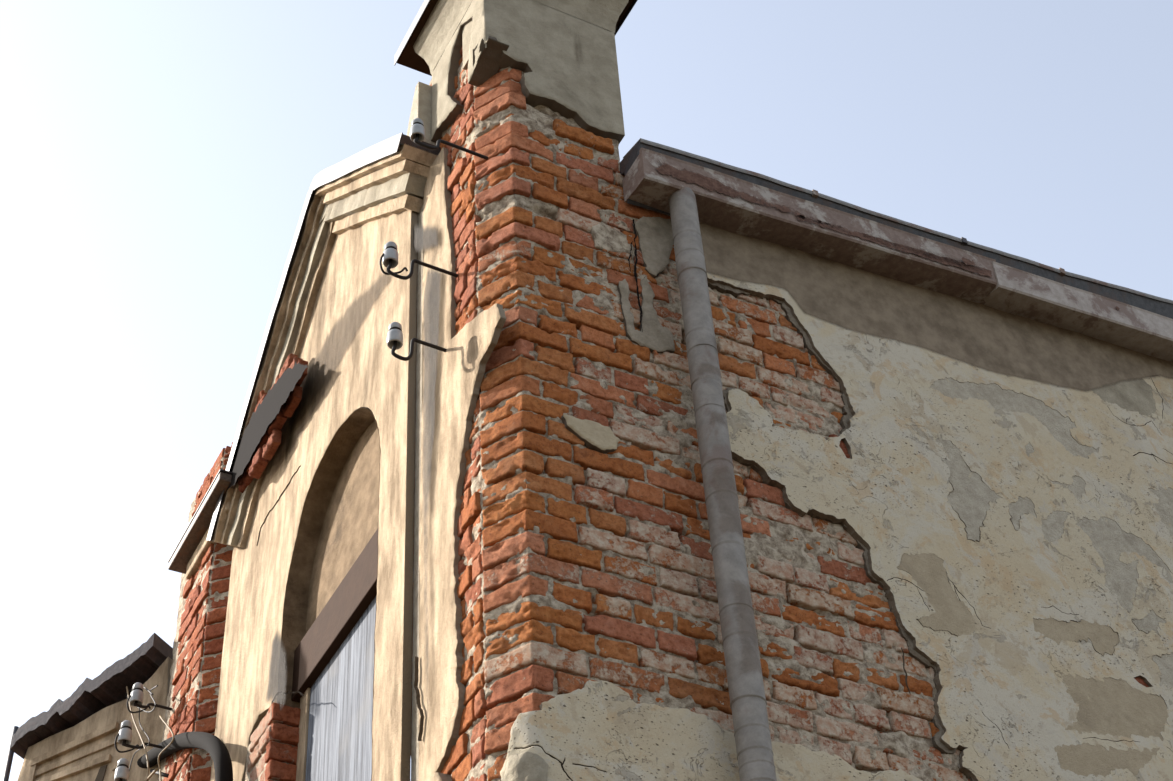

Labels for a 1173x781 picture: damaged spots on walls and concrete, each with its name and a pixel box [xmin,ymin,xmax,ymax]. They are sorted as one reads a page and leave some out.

spalling [188,353,308,525]
spalling [439,43,734,781]
spalling [708,287,850,459]
spalling [158,748,212,781]
spalling [162,543,233,742]
crack [516,745,606,781]
spalling [732,459,979,781]
peeling [1033,617,1119,656]
peeling [1054,652,1173,777]